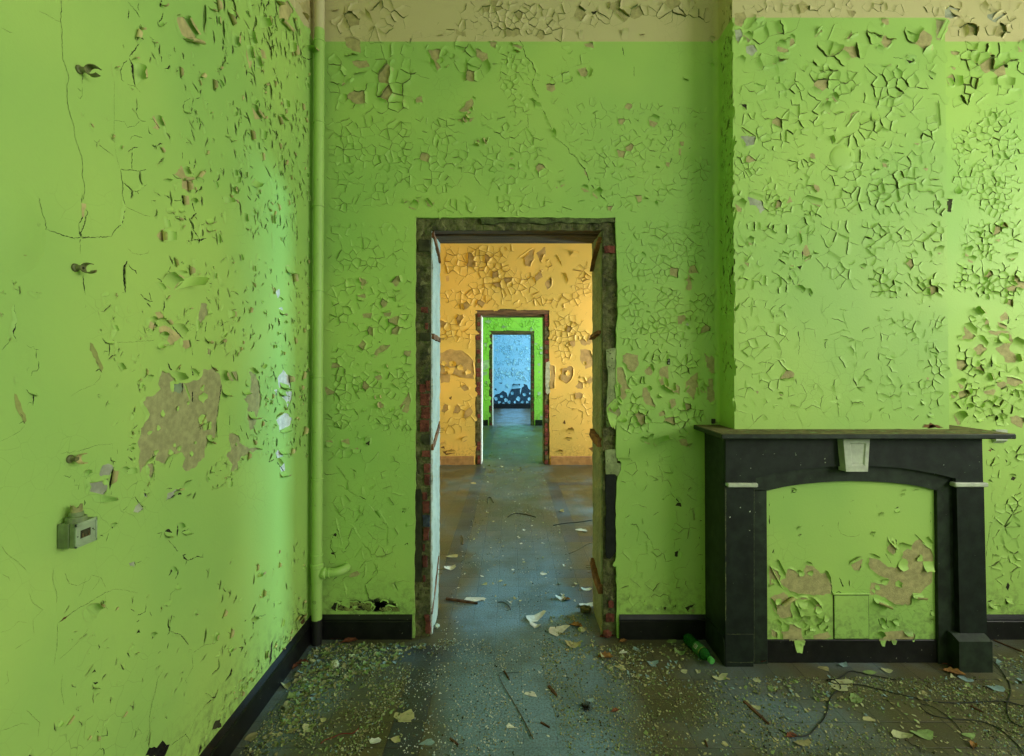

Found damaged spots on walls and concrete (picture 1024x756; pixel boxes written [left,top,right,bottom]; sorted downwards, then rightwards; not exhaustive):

crack [39,4,206,308]
peeling [67,0,319,517]
crack [517,41,608,203]
peeling [241,0,1024,756]